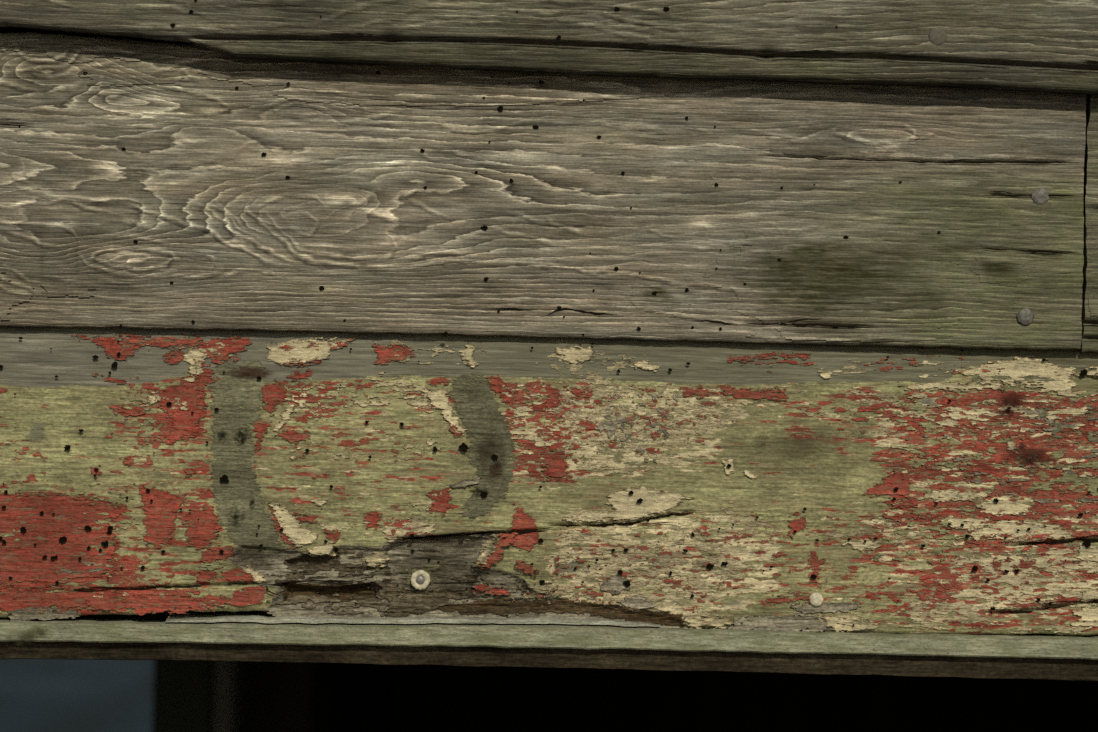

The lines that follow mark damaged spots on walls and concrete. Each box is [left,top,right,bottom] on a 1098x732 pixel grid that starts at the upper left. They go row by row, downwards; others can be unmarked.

peeling [72,333,252,477]
peeling [252,337,488,472]
peeling [0,440,378,621]
peeling [268,476,481,570]
crack [386,512,696,540]
peeling [435,337,1098,634]
crack [1009,538,1098,548]